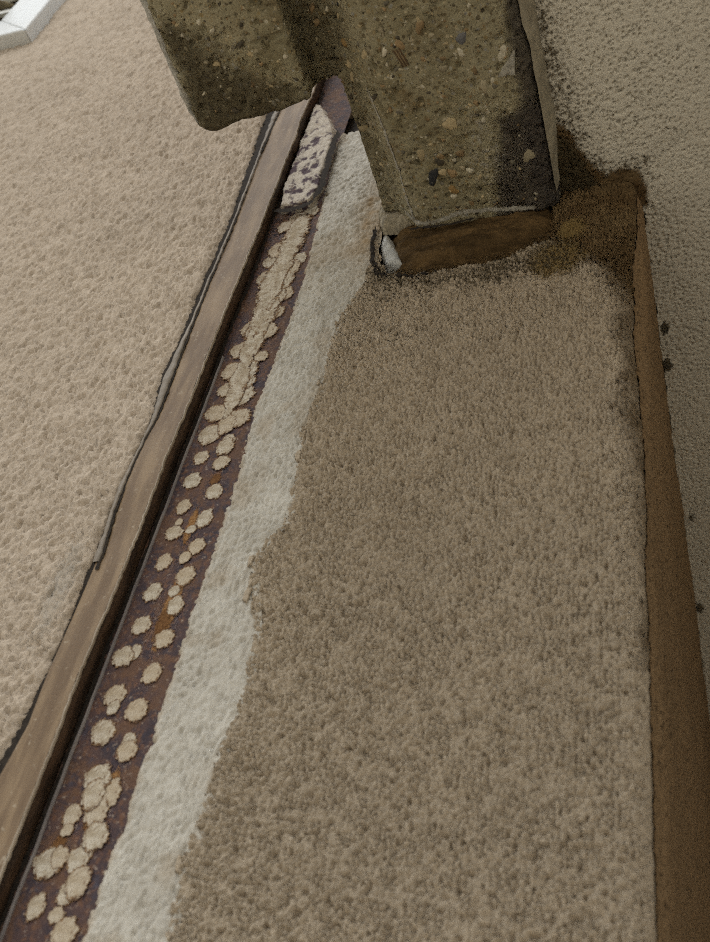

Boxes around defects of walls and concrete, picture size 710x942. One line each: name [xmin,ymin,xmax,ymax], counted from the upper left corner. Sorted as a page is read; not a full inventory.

water stain [365,0,659,326]
corrosion [151,582,183,651]
peeling [82,105,554,942]
corrosion [52,835,66,848]